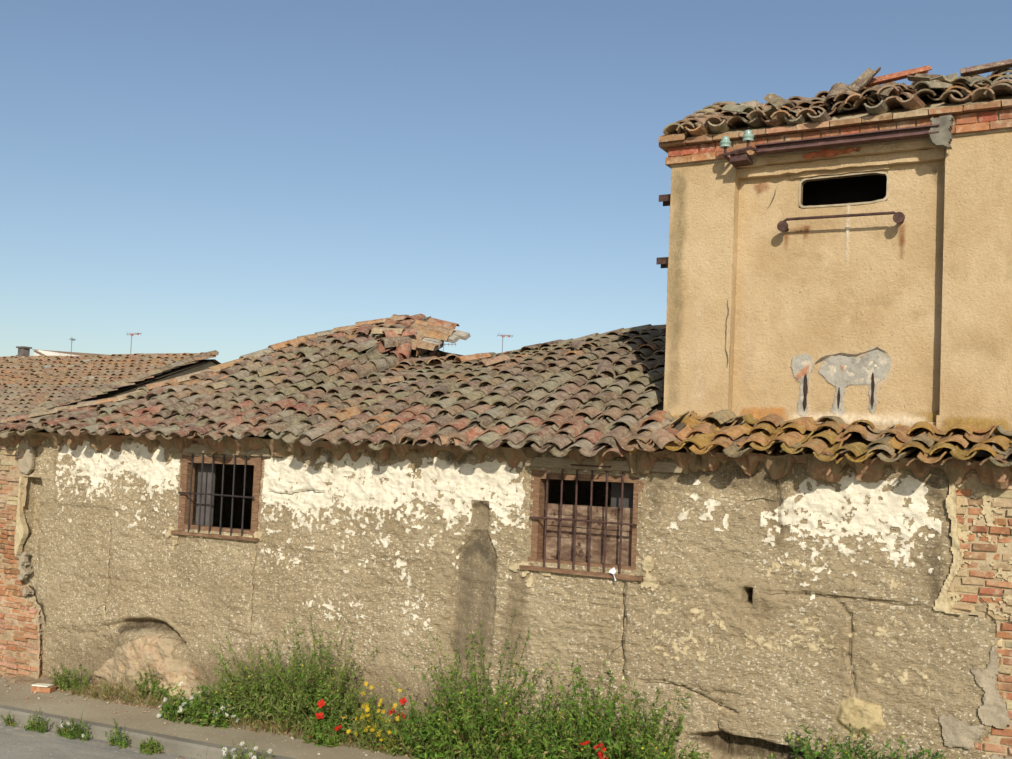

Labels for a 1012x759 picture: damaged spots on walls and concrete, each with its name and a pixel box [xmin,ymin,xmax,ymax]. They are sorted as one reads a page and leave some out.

peeling [55,440,525,636]
flaking render [506,550,551,588]
flaking render [621,555,726,630]
peeling [667,480,729,531]
peeling [758,473,1012,617]
crack [608,584,630,685]
peeling [645,630,730,662]
peeling [746,615,930,696]
crack [765,592,931,690]
crack [658,682,736,754]
peeling [939,714,985,749]